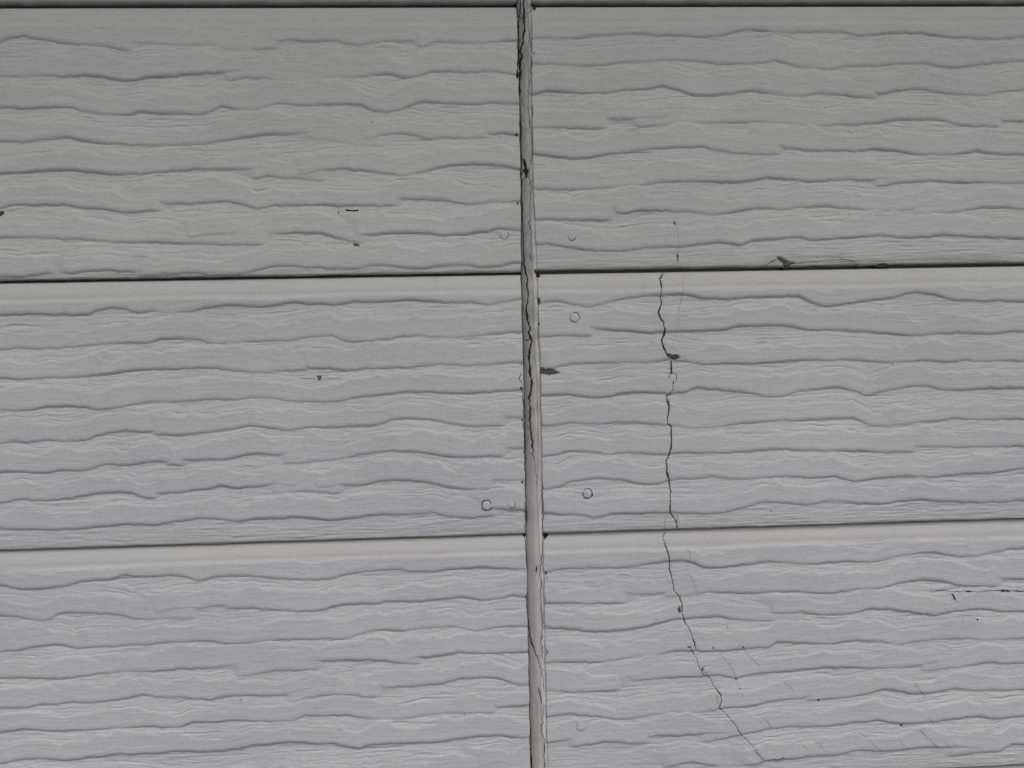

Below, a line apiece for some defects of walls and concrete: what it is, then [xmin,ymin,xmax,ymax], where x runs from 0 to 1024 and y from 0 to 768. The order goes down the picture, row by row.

crack [503,0,534,260]
crack [518,288,548,768]
crack [643,217,828,761]